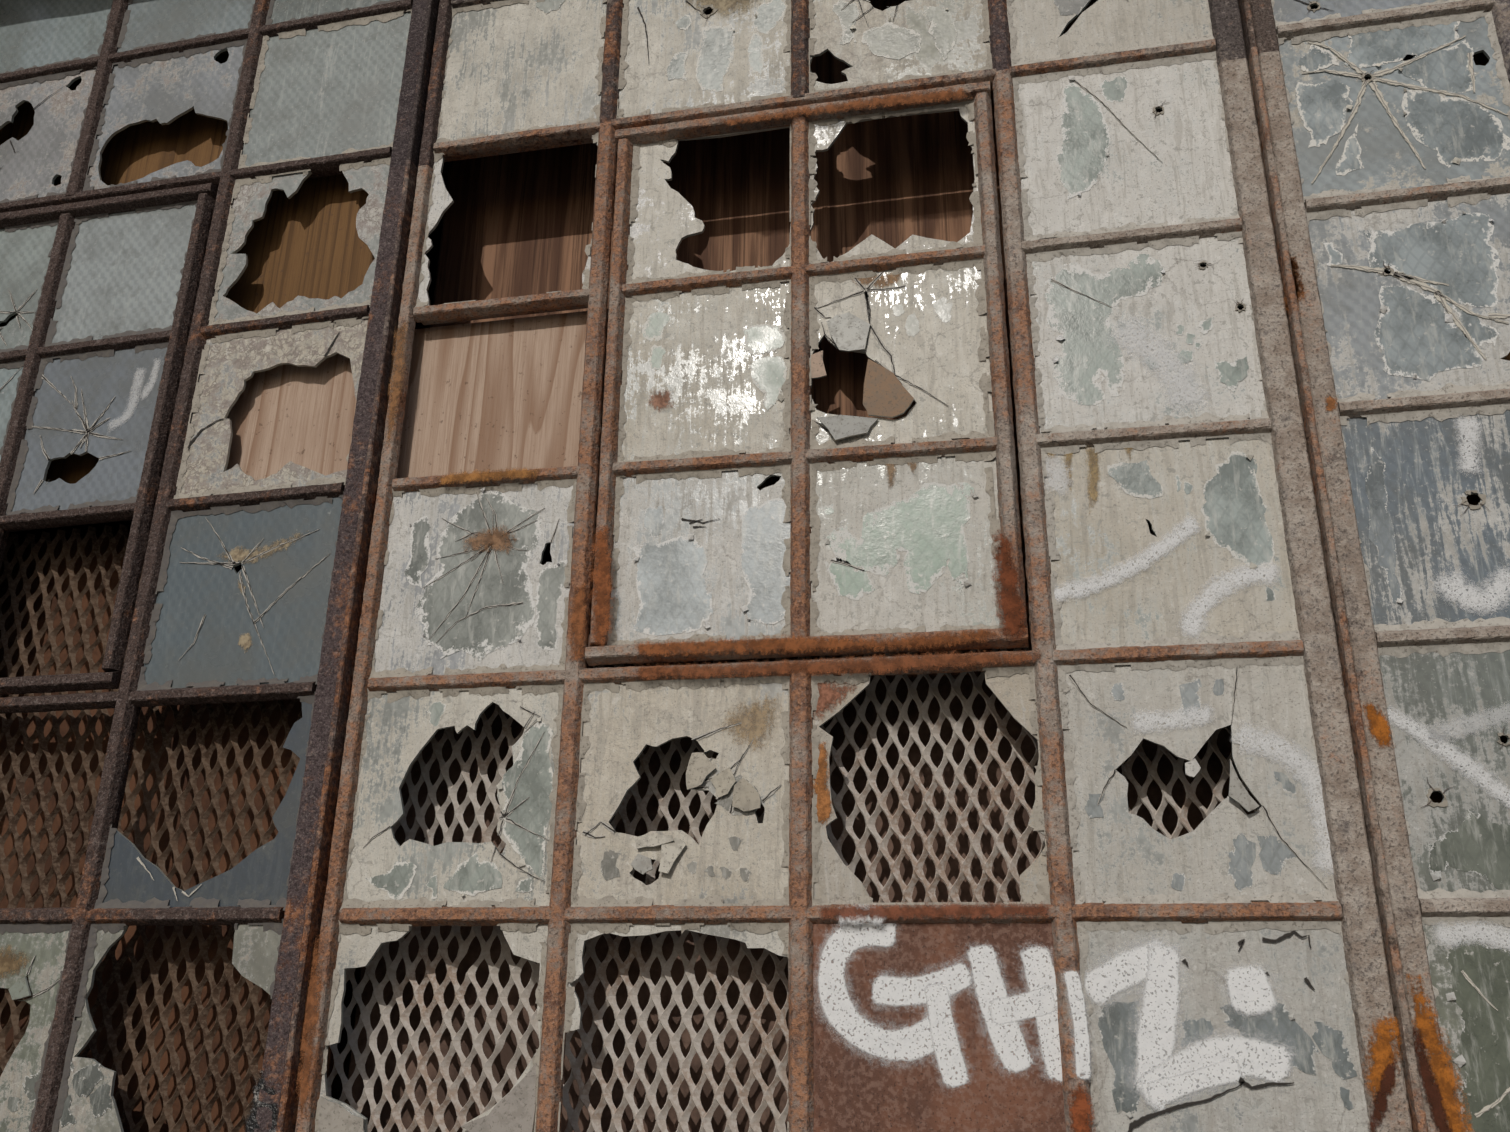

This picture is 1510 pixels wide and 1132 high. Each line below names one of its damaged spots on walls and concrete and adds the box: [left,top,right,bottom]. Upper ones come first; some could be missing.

corrosion [720,87,967,126]
crack [1297,0,1509,184]
crack [0,289,131,494]
peeling [742,324,788,410]
peeling [1045,254,1165,405]
crack [1331,265,1510,360]
crack [179,517,329,675]
peeling [404,487,567,661]
corrosion [638,530,1040,717]
peeling [823,482,978,600]
corrosion [1363,704,1391,747]
corrosion [1363,974,1473,1132]